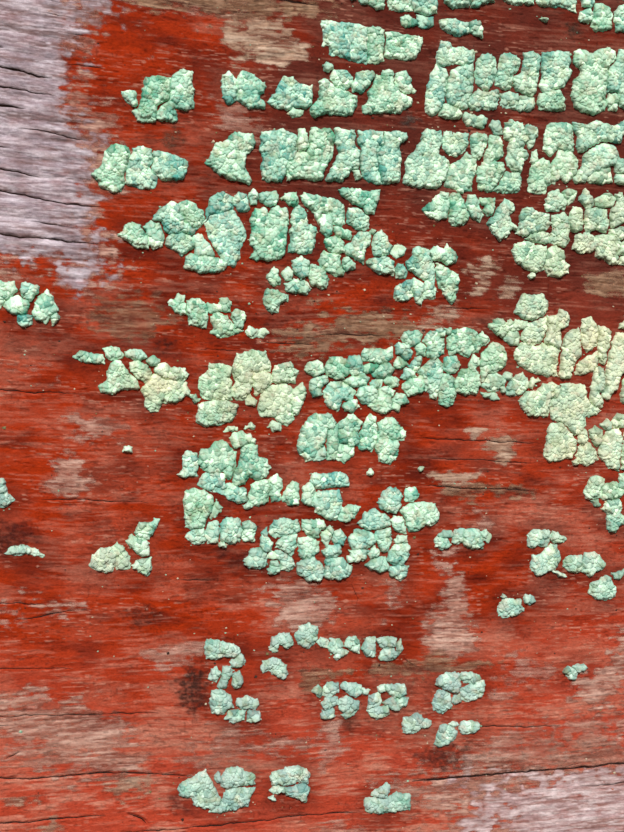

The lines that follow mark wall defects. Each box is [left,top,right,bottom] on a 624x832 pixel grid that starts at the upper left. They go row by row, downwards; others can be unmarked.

peeling [0,0,624,533]
crack [417,437,536,463]
crack [424,484,528,492]
peeling [177,422,440,676]
peeling [418,466,536,714]
peeling [527,529,624,601]
crack [0,772,186,780]
peeling [176,638,313,814]
peeling [300,668,624,832]
crack [416,762,624,786]
crack [0,815,99,824]
crack [129,812,353,832]